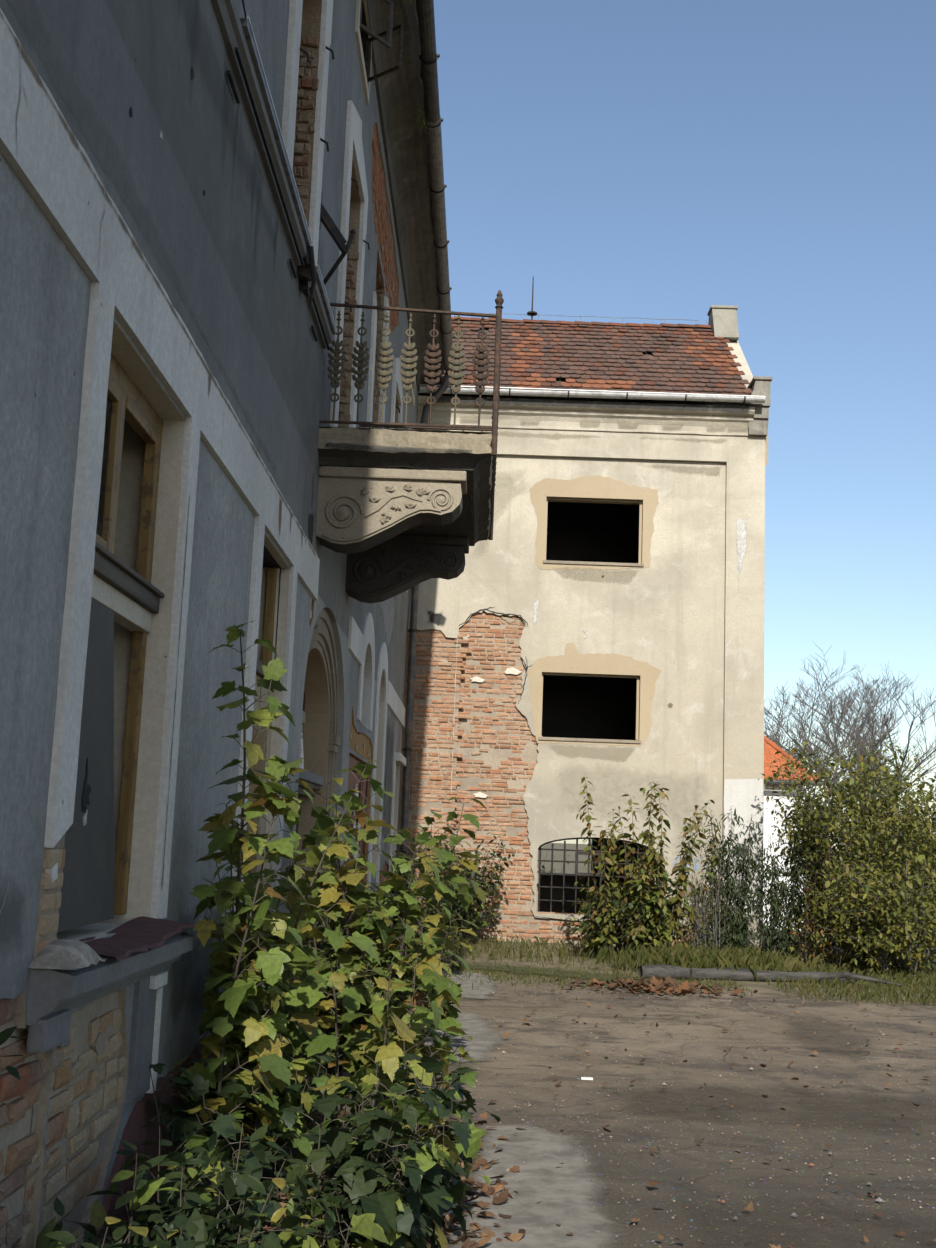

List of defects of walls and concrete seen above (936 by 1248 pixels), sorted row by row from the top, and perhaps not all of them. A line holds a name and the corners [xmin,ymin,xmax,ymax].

spalling [372,124,398,332]
spalling [34,834,66,958]
spalling [374,611,629,945]
spalling [15,991,126,1248]